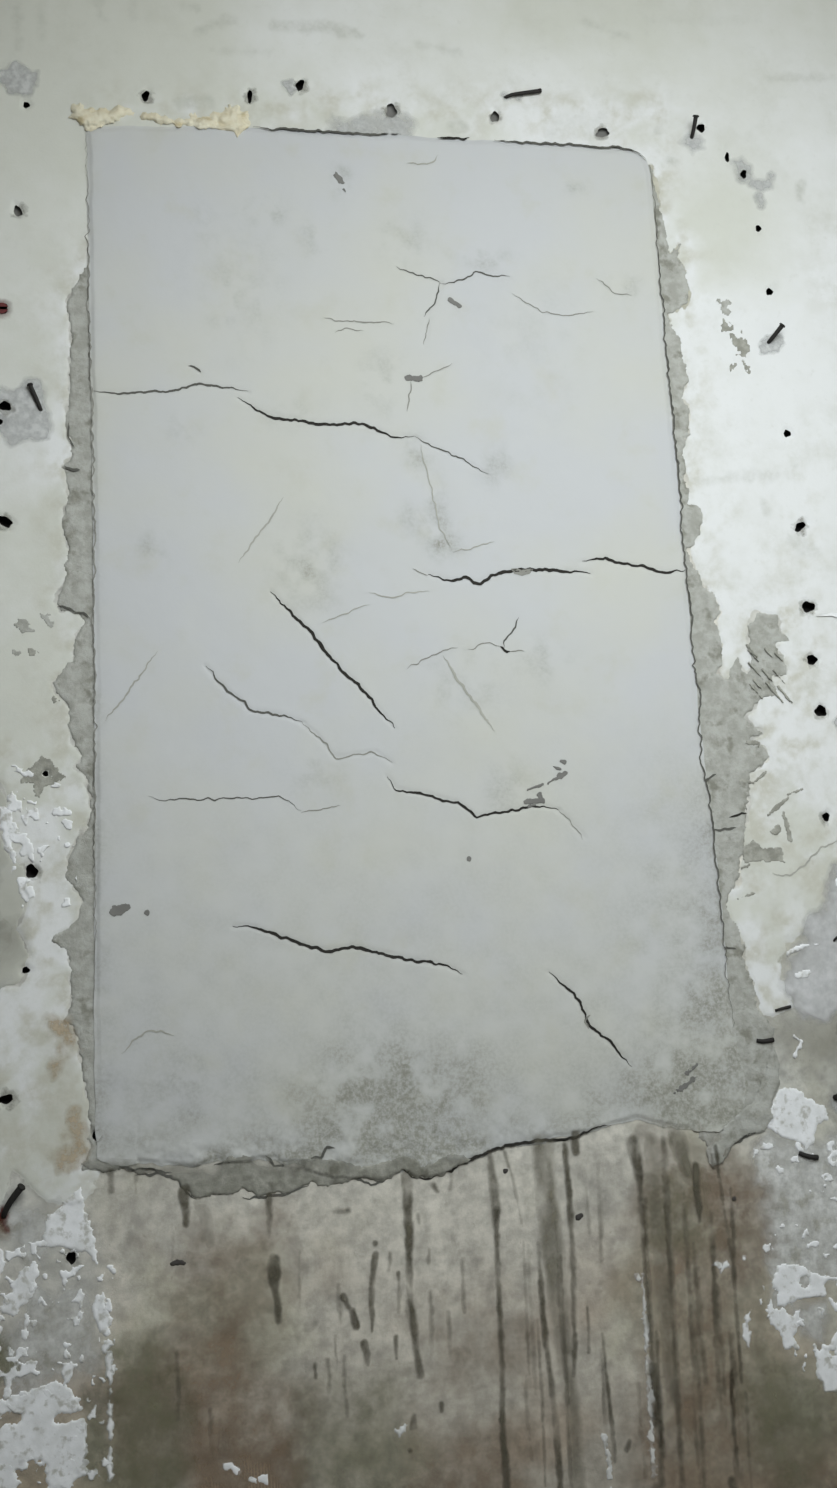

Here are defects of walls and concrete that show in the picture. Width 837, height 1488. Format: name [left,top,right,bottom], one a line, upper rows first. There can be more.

crack [58,126,747,1026]
spalling [648,161,837,1201]
spalling [0,265,150,1488]
crack [549,972,629,1064]
water stain [168,1328,302,1488]
water stain [269,1256,281,1322]
water stain [340,1241,378,1355]
water stain [397,1195,413,1276]
water stain [395,1302,423,1373]
water stain [535,1131,579,1411]
water stain [627,1134,767,1483]
peeling [711,1224,837,1395]